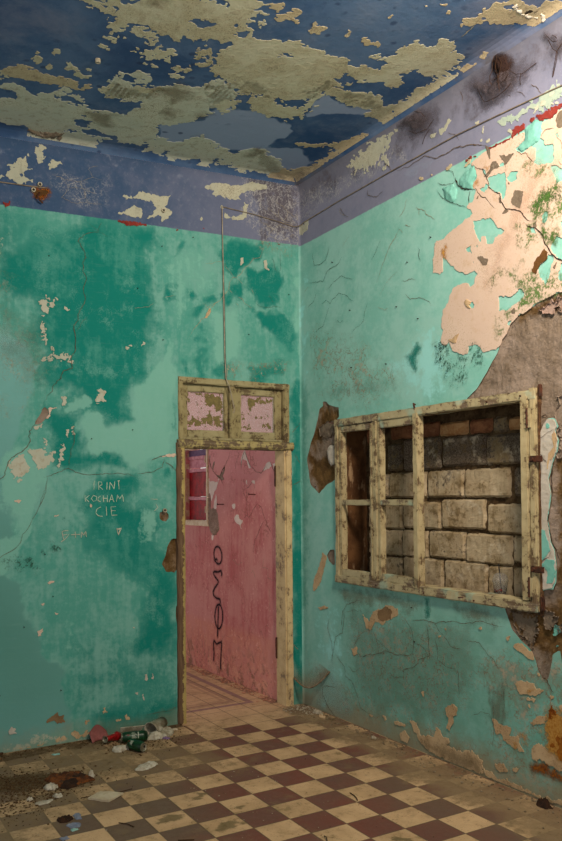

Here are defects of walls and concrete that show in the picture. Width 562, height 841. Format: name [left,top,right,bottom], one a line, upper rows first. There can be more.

peeling [460,0,562,27]
peeling [0,0,489,222]
crack [384,133,562,261]
crack [0,166,105,479]
peeling [38,295,73,363]
crack [0,426,174,558]
flaking render [308,402,339,493]
crack [307,202,434,332]
damp [434,342,482,383]
peeling [433,80,562,708]
crack [321,600,504,716]
corrosion [530,705,562,781]